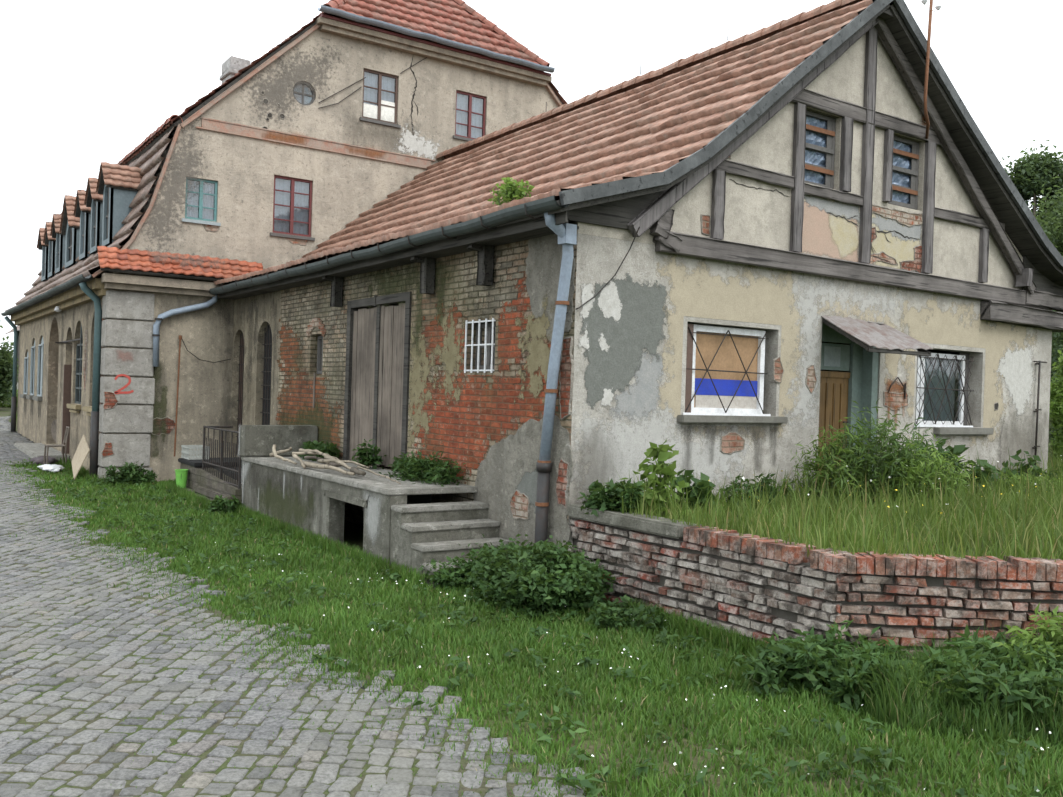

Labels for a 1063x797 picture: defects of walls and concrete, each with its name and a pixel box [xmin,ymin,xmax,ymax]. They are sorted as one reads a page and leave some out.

crack [410,57,418,135]
flaking render [396,123,443,161]
peeling [800,194,923,273]
flaking render [151,417,175,436]
flaking render [276,277,351,459]
peeling [407,234,1037,548]